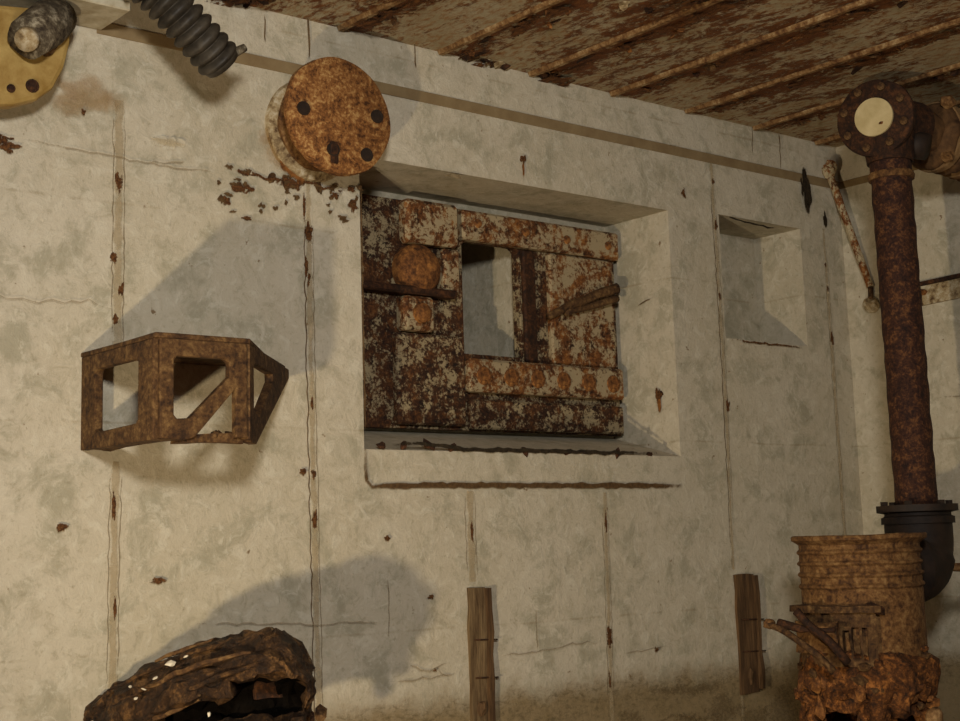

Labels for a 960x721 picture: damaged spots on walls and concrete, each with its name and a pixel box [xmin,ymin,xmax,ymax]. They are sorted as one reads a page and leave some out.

rust [0,134,22,153]
rust [655,388,663,412]